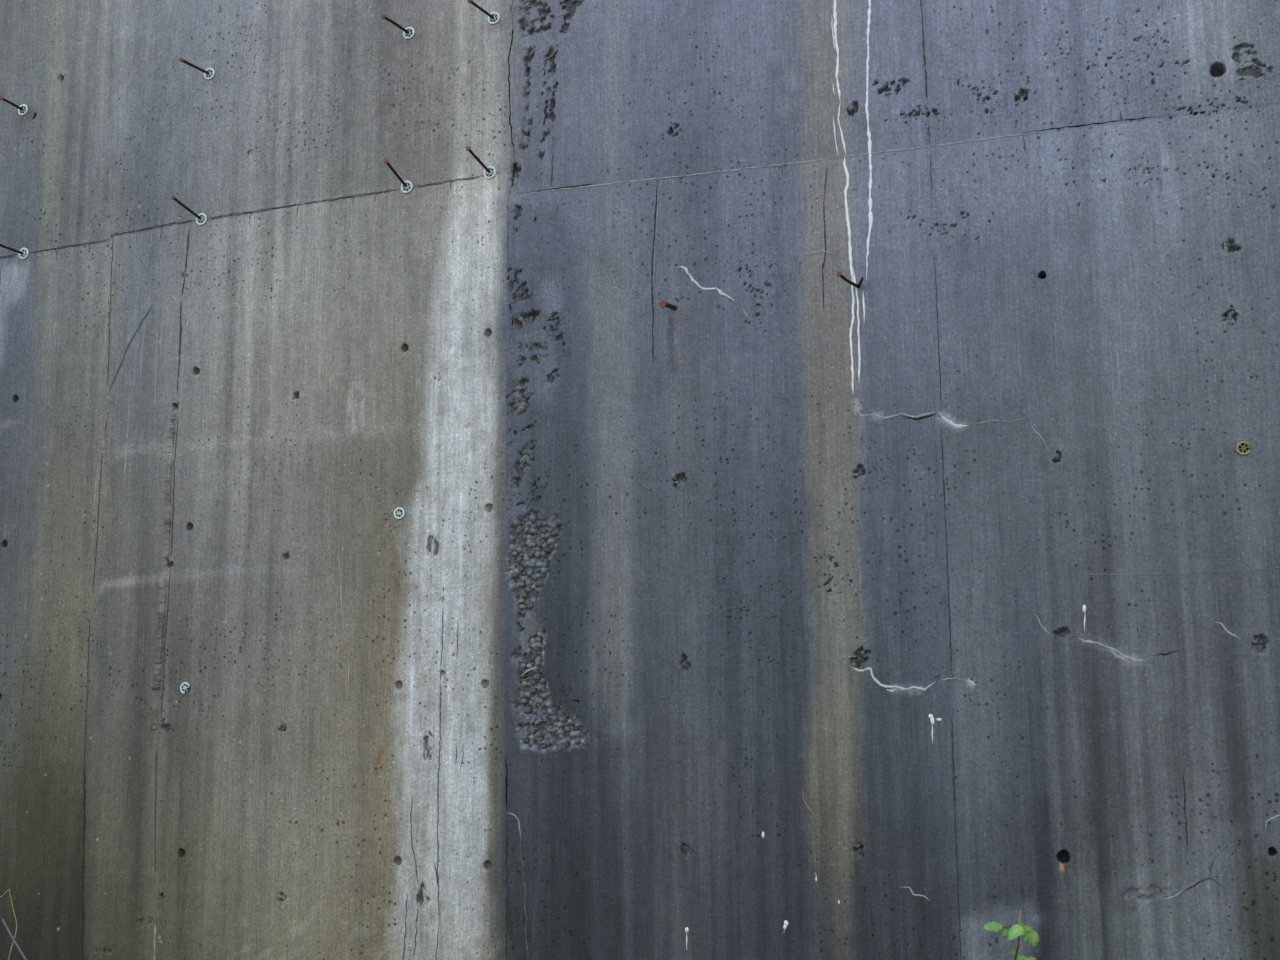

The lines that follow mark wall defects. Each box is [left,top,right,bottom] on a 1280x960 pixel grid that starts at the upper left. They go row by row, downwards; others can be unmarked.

spalling [856,0,1280,264]
spalling [494,0,597,524]
crack [678,249,747,316]
spalling [711,203,808,358]
damp [773,0,886,534]
crack [854,399,1050,451]
damp [582,210,707,847]
crack [852,667,975,692]
crack [1034,614,1177,663]
damp [794,613,927,960]
damp [951,791,1067,960]
damp [1207,795,1280,960]